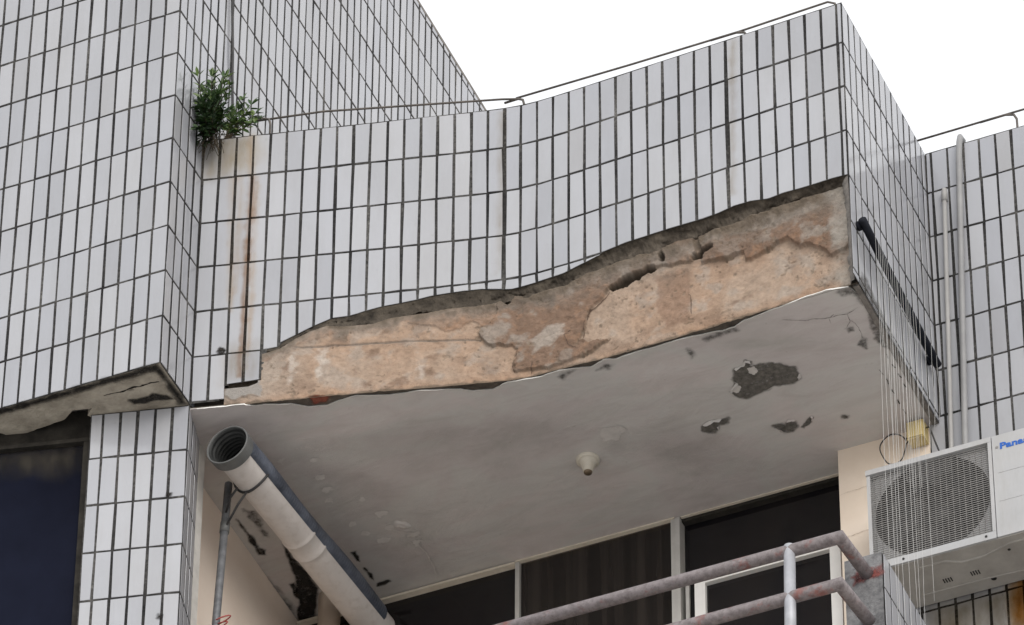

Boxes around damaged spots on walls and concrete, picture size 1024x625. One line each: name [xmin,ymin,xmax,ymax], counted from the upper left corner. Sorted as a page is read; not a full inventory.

spalling [0,175,892,414]
crack [104,381,159,396]
peeling [701,417,729,433]
peeling [772,416,813,433]